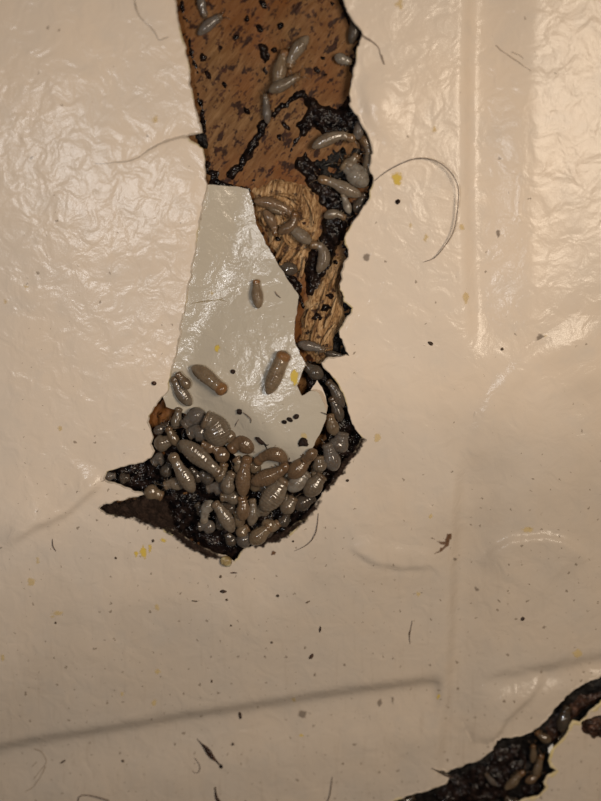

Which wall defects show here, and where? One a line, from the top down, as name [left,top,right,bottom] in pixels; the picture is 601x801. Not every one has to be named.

peeling [98,0,374,563]
peeling [392,675,601,801]